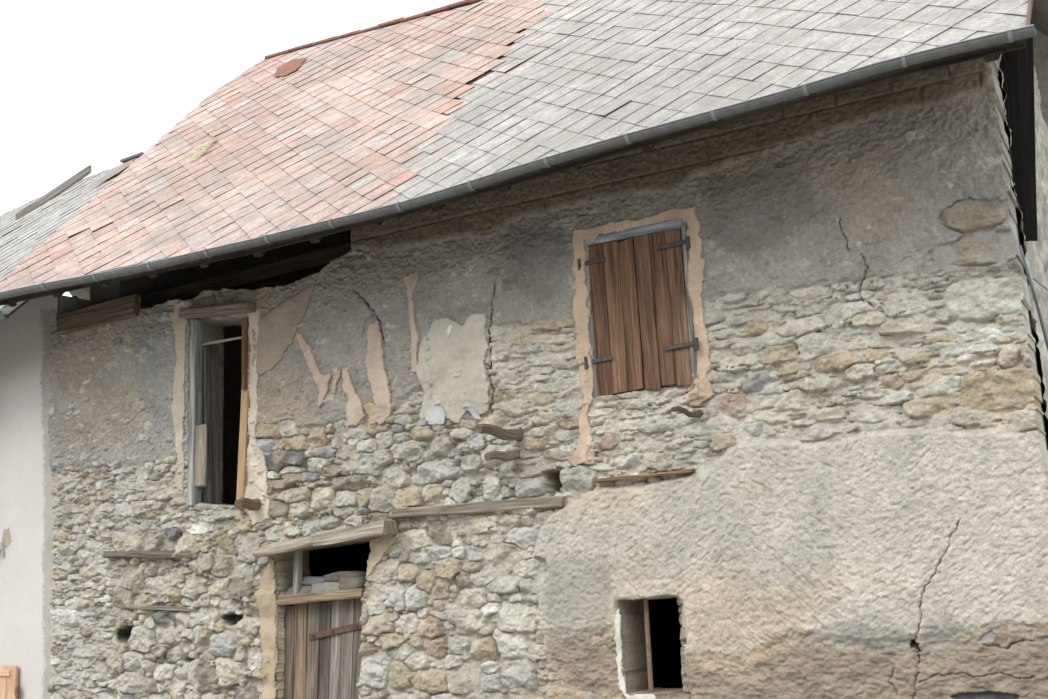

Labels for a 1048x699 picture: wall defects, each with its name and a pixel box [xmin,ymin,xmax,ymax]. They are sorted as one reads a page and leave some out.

peeling [166,308,188,493]
peeling [242,283,393,526]
peeling [403,270,491,425]
crack [486,284,496,411]
crack [941,640,1032,679]